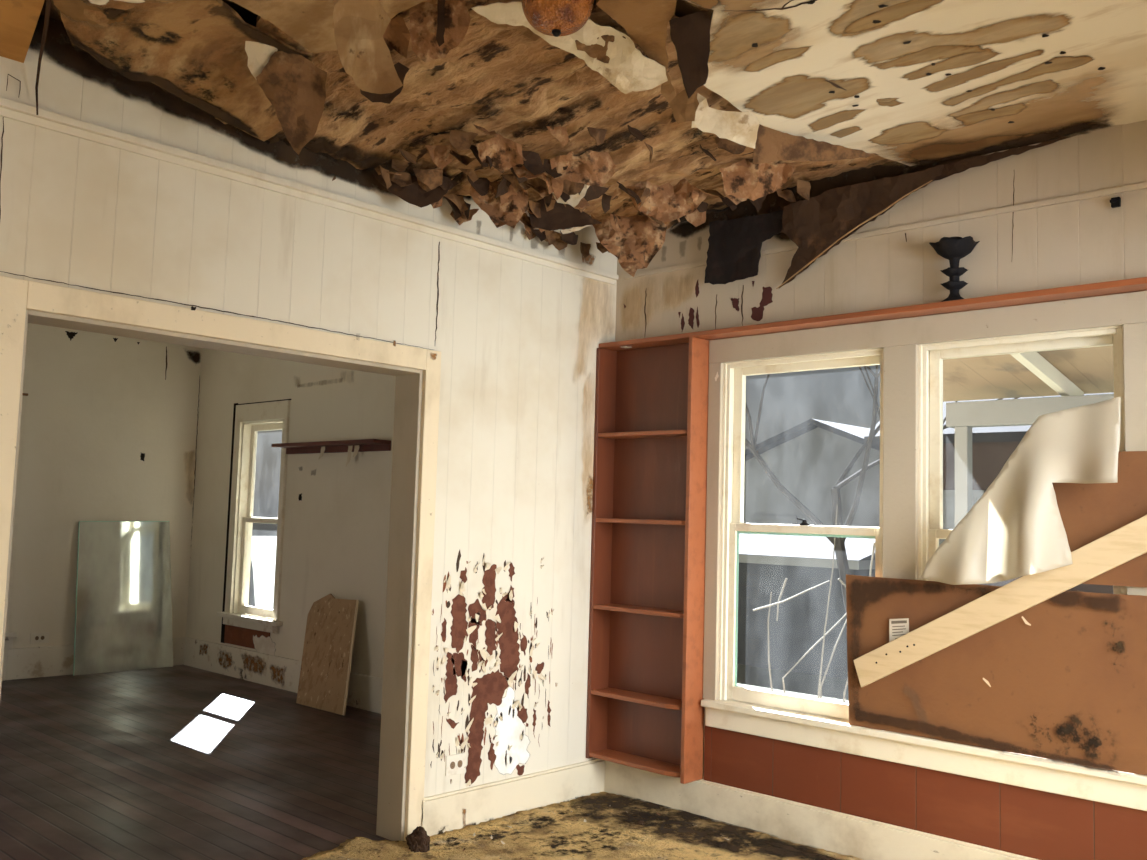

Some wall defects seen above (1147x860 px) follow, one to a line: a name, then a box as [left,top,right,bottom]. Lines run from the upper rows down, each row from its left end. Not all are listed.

crack [0,74,21,219]
water stain [29,0,526,195]
water stain [513,99,601,138]
water stain [573,125,659,156]
water stain [670,0,1110,238]
water stain [443,170,473,200]
crack [0,242,440,350]
peeling [678,280,700,331]
peeling [731,281,773,321]
peeling [199,635,284,685]
peeling [430,550,558,787]